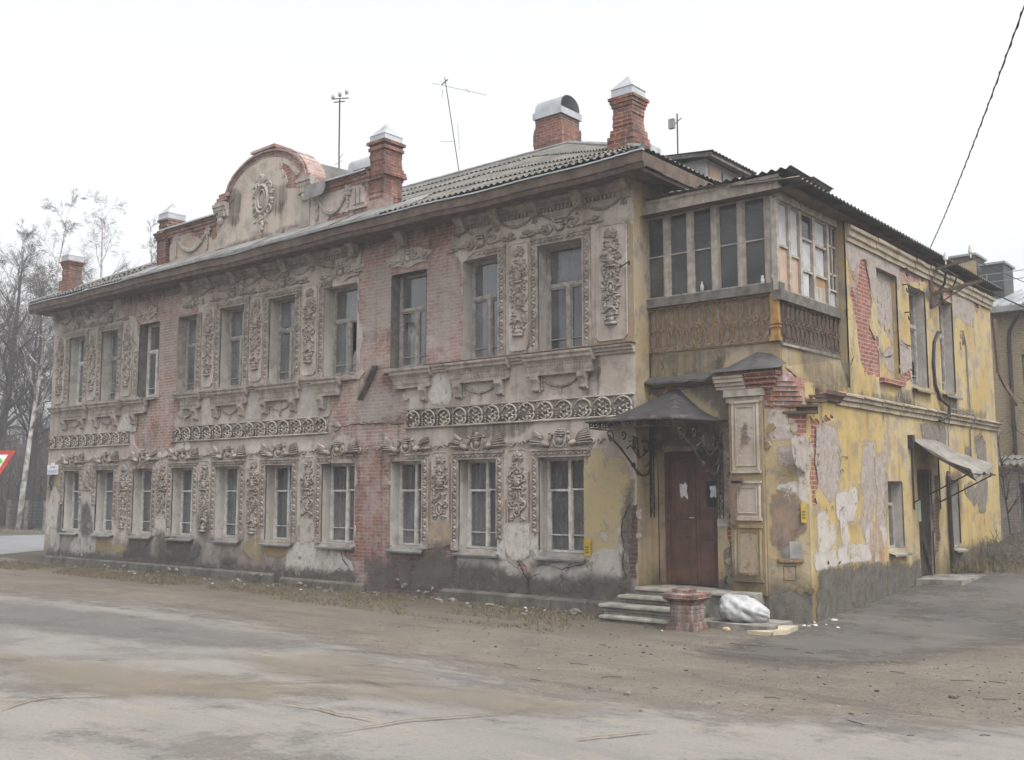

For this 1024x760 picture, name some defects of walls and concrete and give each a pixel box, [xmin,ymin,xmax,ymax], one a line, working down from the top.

flaking render [846,242,980,382]
peeling [763,388,841,506]
peeling [965,431,987,462]
leakage [80,504,93,534]
leakage [47,515,359,584]
leakage [457,489,633,600]
crack [508,560,589,590]
crack [621,501,632,580]
leakage [770,488,806,550]
leakage [764,559,922,624]
peeling [860,440,889,537]
peeling [964,475,988,514]